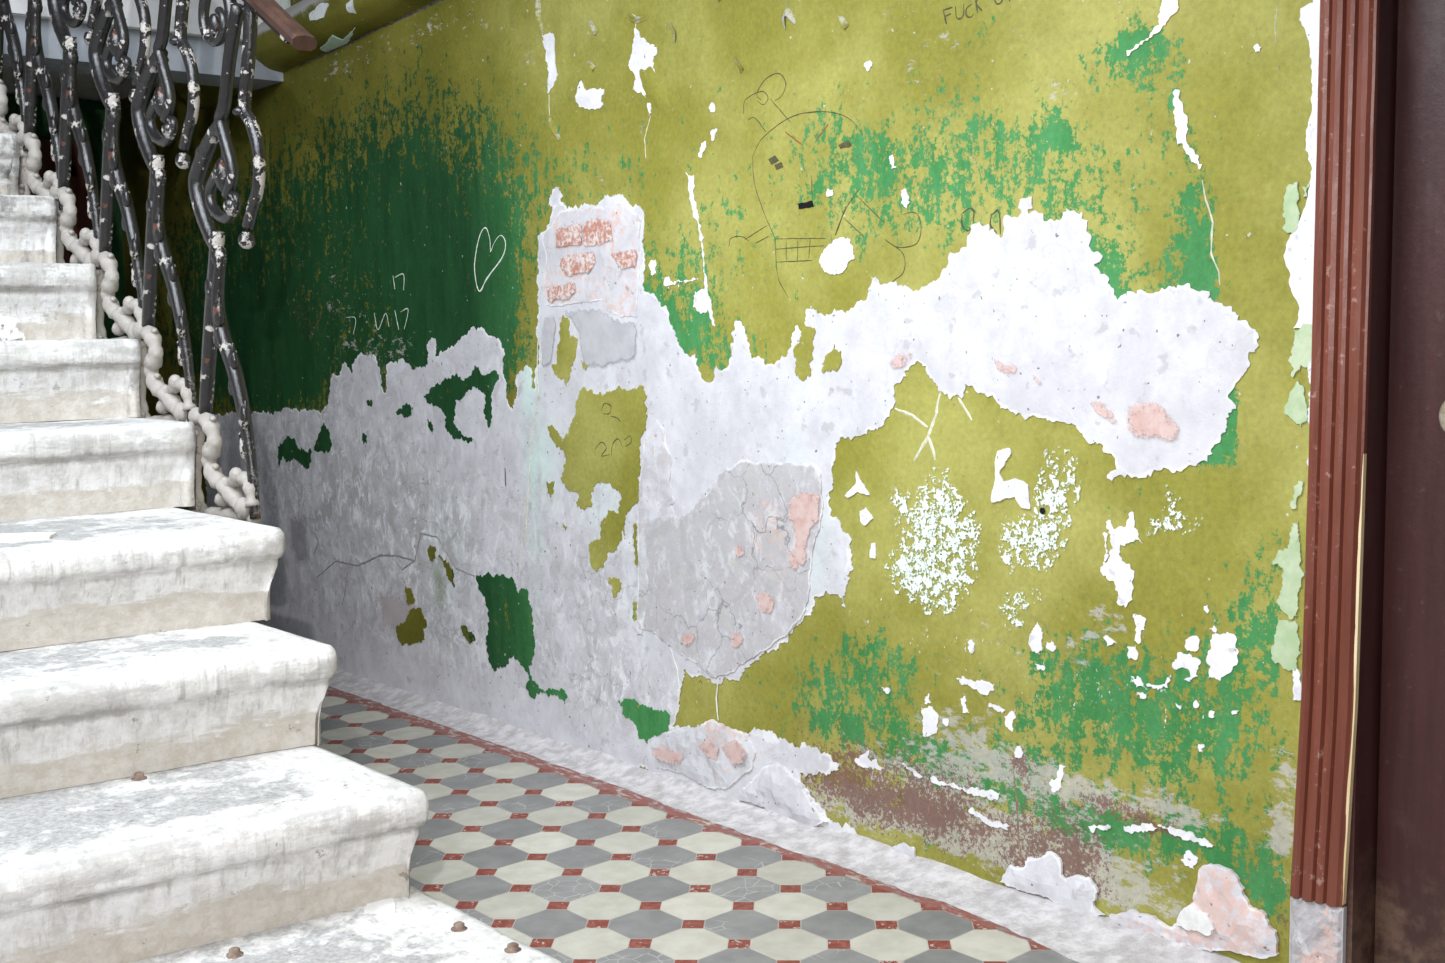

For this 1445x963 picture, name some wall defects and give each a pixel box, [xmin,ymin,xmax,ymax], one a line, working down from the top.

peeling [309,3,329,21]
peeling [320,0,356,52]
peeling [535,0,558,93]
peeling [781,9,796,29]
peeling [837,12,849,29]
peeling [698,129,718,158]
peeling [1173,89,1203,170]
crack [1202,180,1220,285]
crack [895,392,972,461]
peeling [205,173,1259,835]
flaking render [1000,823,1279,959]